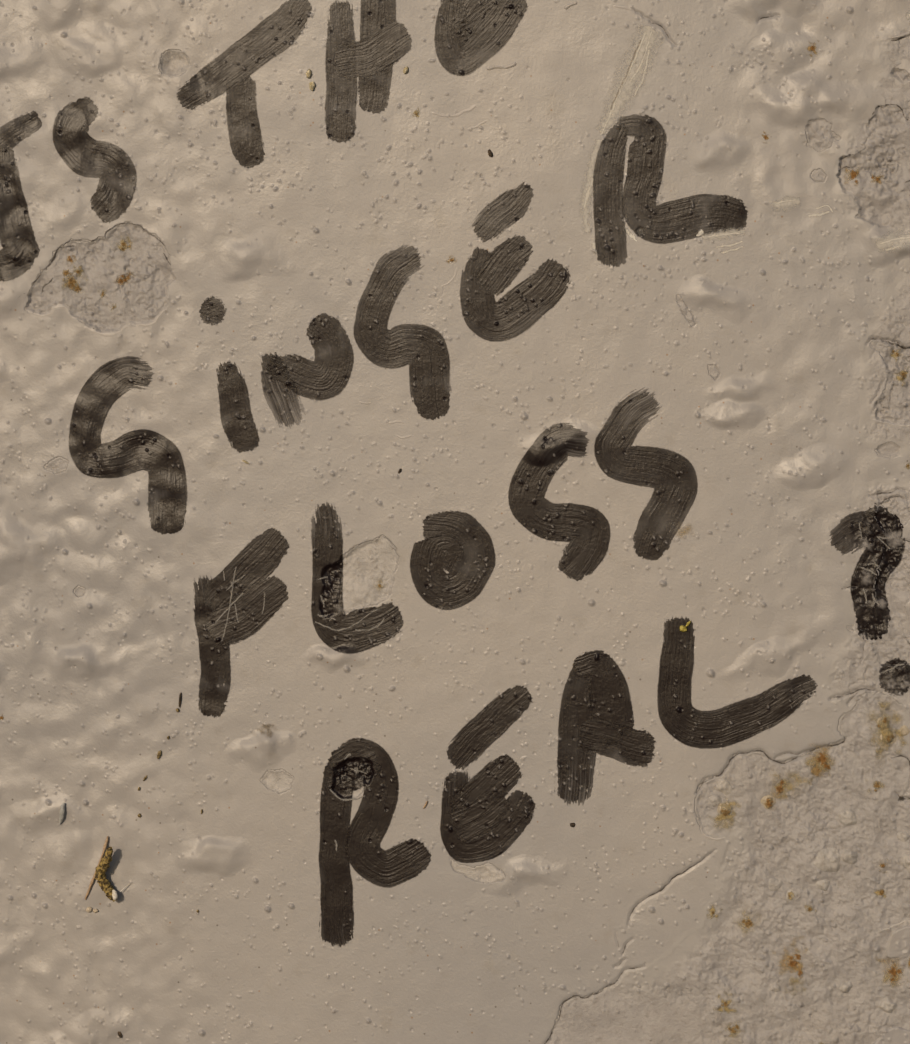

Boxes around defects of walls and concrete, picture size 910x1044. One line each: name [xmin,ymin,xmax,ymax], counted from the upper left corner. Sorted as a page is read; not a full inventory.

peeling [805,20,910,239]
peeling [25,222,176,332]
peeling [858,255,910,458]
peeling [326,535,399,613]
peeling [546,478,910,1044]